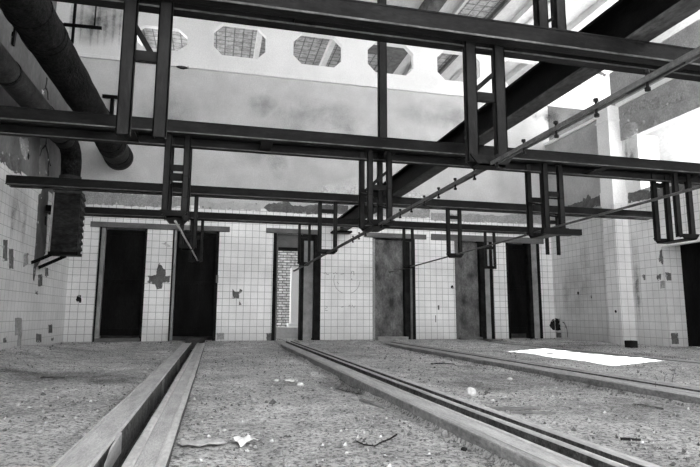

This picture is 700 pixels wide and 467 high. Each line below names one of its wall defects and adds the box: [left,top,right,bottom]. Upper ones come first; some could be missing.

flaking render [0,137,30,175]
spalling [2,240,14,269]
spalling [147,263,170,289]
spalling [656,249,671,289]
spalling [3,318,22,346]